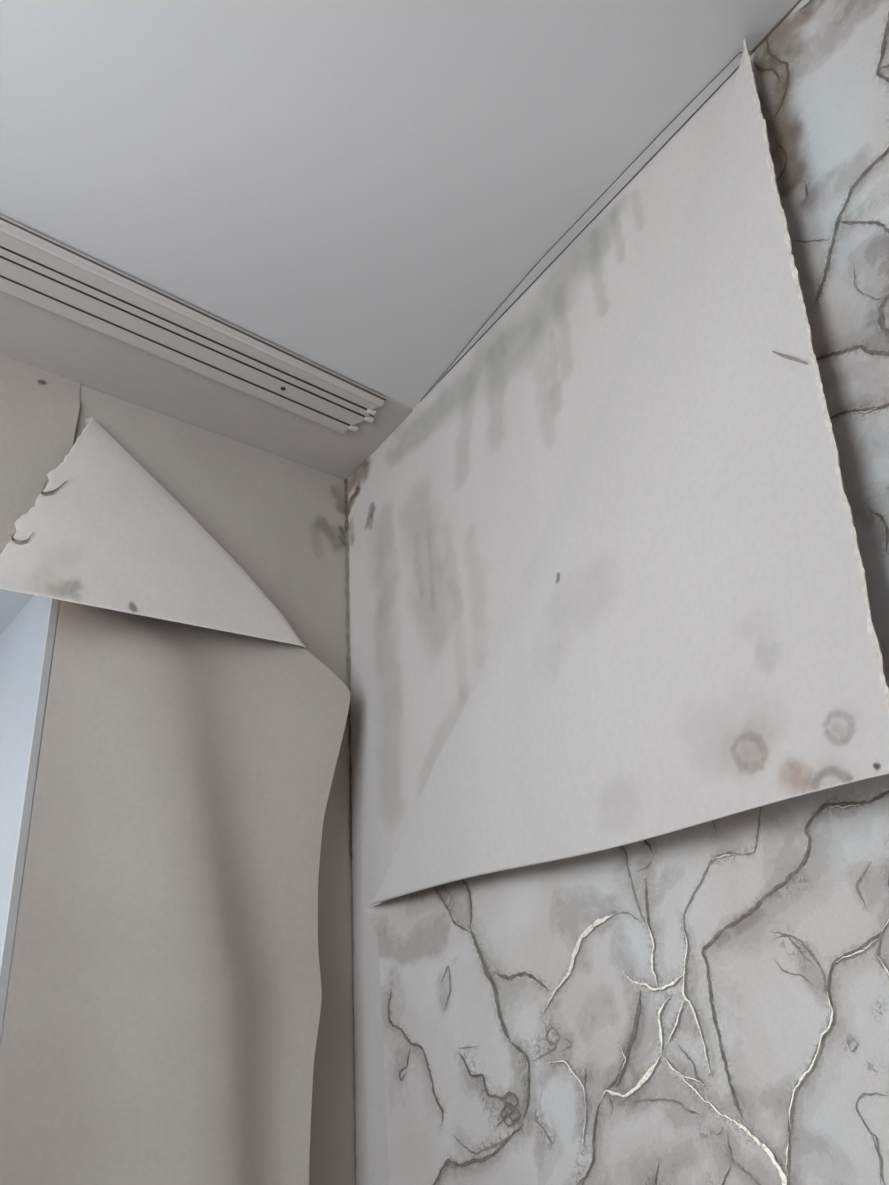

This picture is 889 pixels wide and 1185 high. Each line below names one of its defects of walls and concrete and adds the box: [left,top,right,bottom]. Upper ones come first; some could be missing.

peeling [0,418,306,648]
peeling [370,39,889,905]